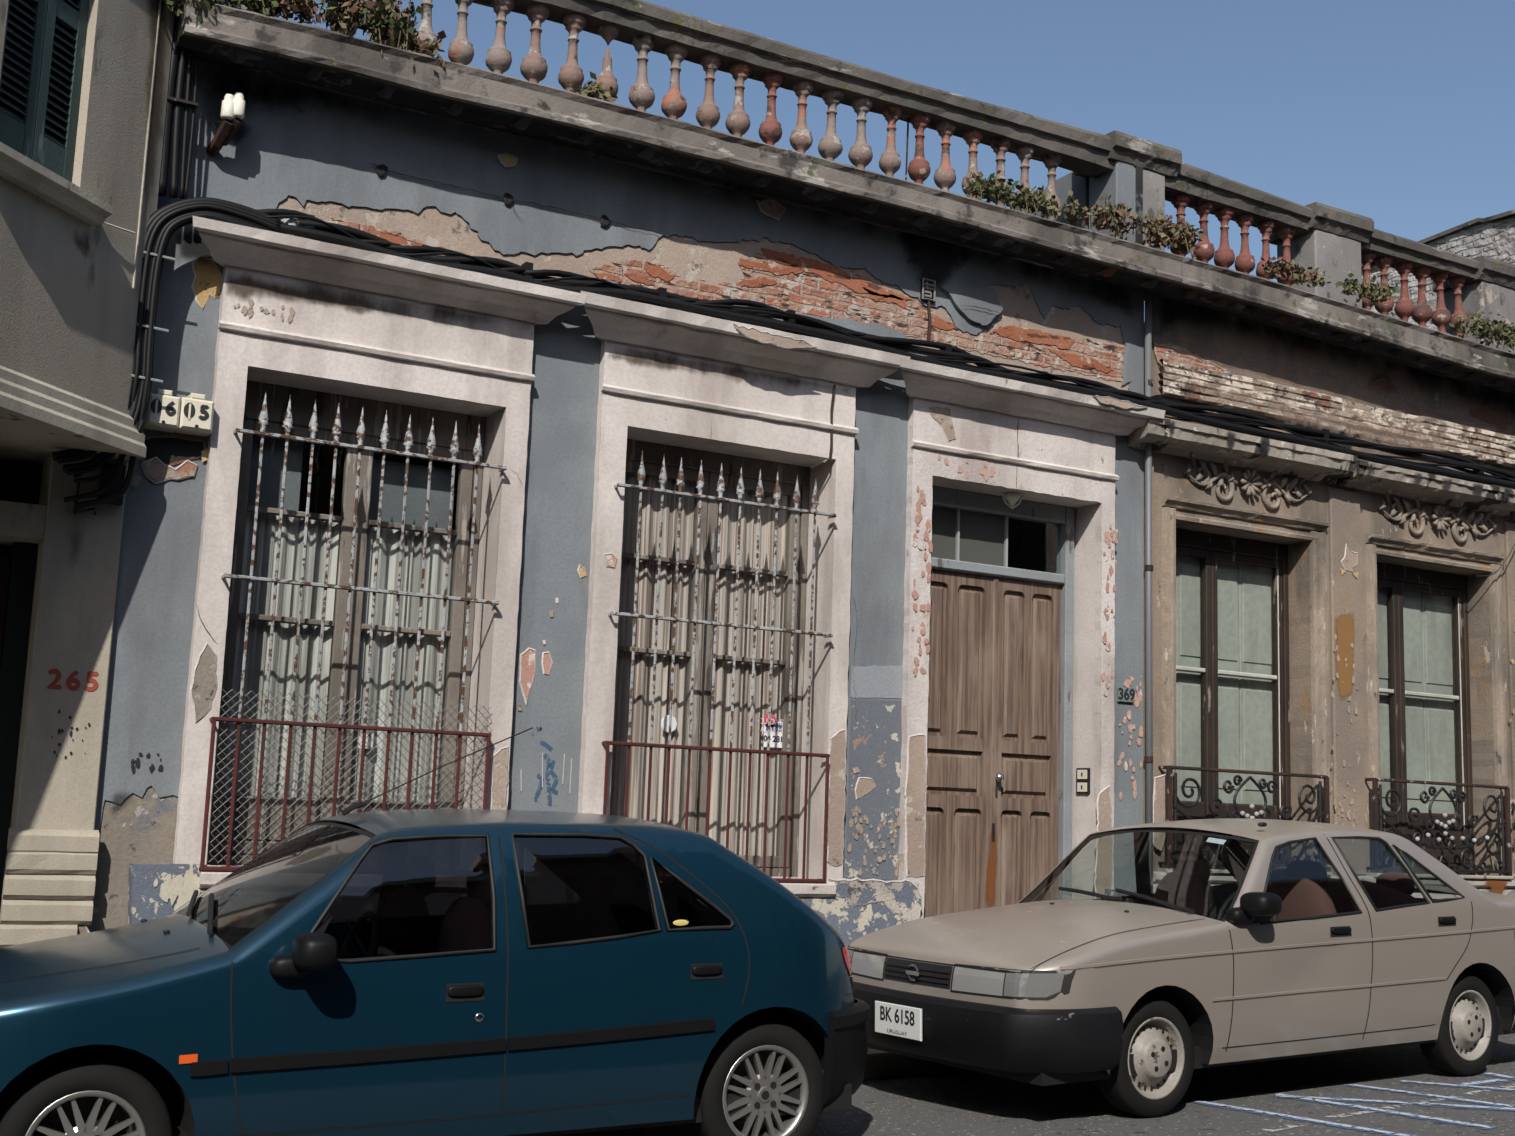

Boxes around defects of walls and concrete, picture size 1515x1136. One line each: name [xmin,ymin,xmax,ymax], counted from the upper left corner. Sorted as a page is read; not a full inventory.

flaking render [503,192,514,206]
flaking render [191,257,294,323]
flaking render [277,196,1507,433]
flaking render [132,435,209,488]
peeling [912,485,933,676]
flaking render [189,642,218,723]
peeling [517,640,553,711]
peeling [77,752,201,935]
flaking render [826,729,927,923]